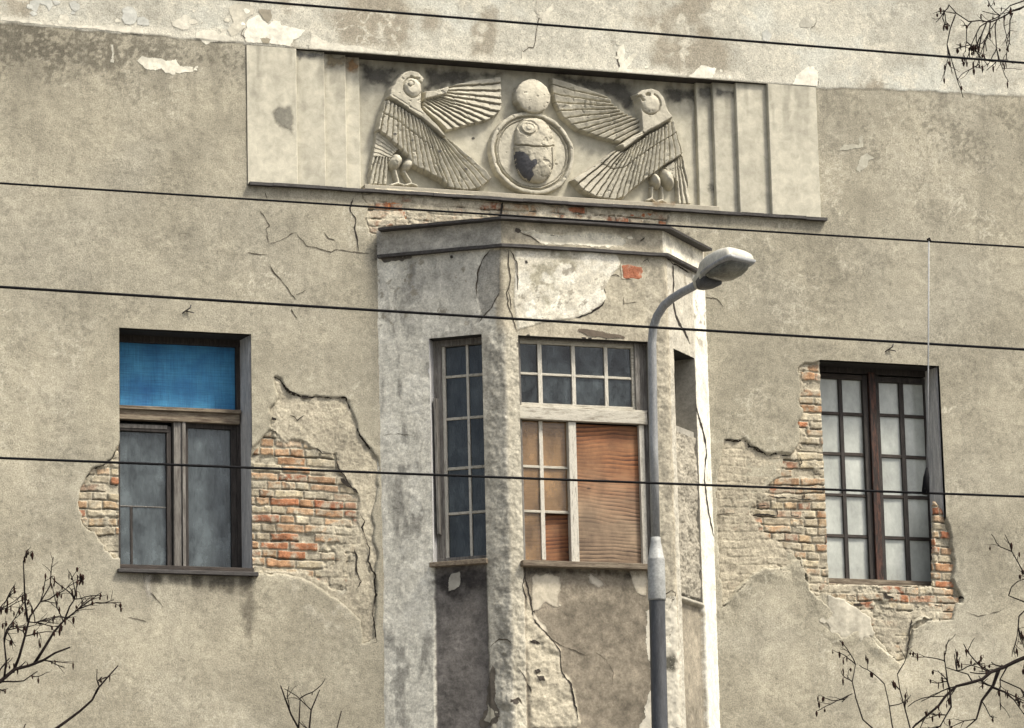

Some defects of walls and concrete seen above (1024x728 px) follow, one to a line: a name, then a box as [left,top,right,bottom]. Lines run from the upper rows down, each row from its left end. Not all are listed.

peeling [137,56,198,75]
peeling [172,3,398,55]
crack [247,193,370,318]
flaking render [349,188,669,251]
crack [476,232,554,334]
flaking render [78,447,119,558]
flaking render [251,377,378,643]
crack [695,402,734,535]
flaking render [716,362,964,662]
peeling [531,573,561,633]
peeling [639,691,652,728]
peeling [665,596,683,728]